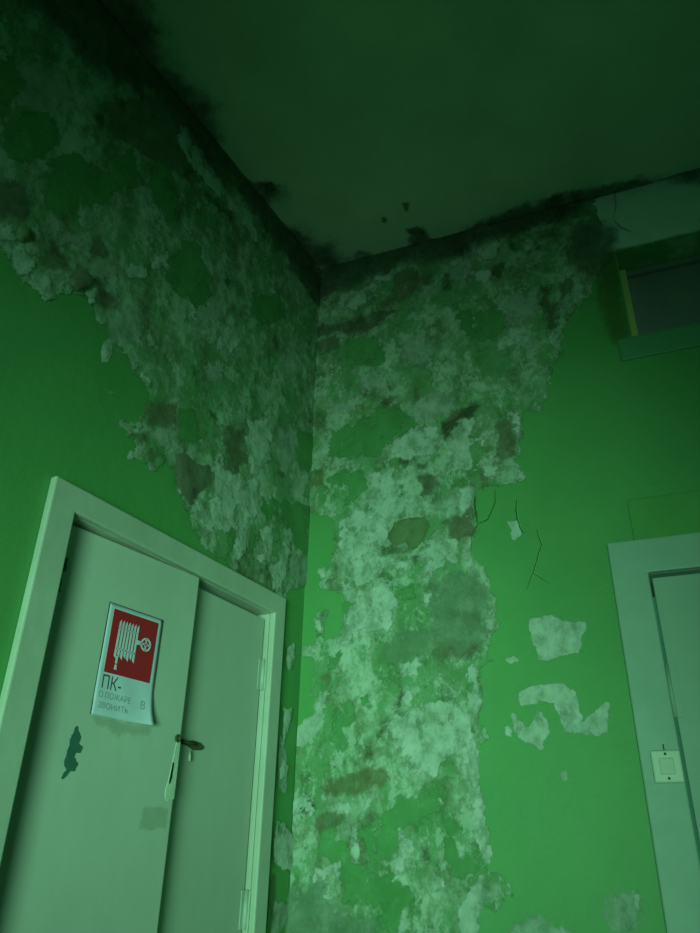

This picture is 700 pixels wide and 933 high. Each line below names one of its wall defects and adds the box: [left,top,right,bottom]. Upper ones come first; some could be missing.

peeling [0,0,321,597]
water stain [32,0,652,296]
peeling [270,199,610,933]
crack [471,495,547,588]